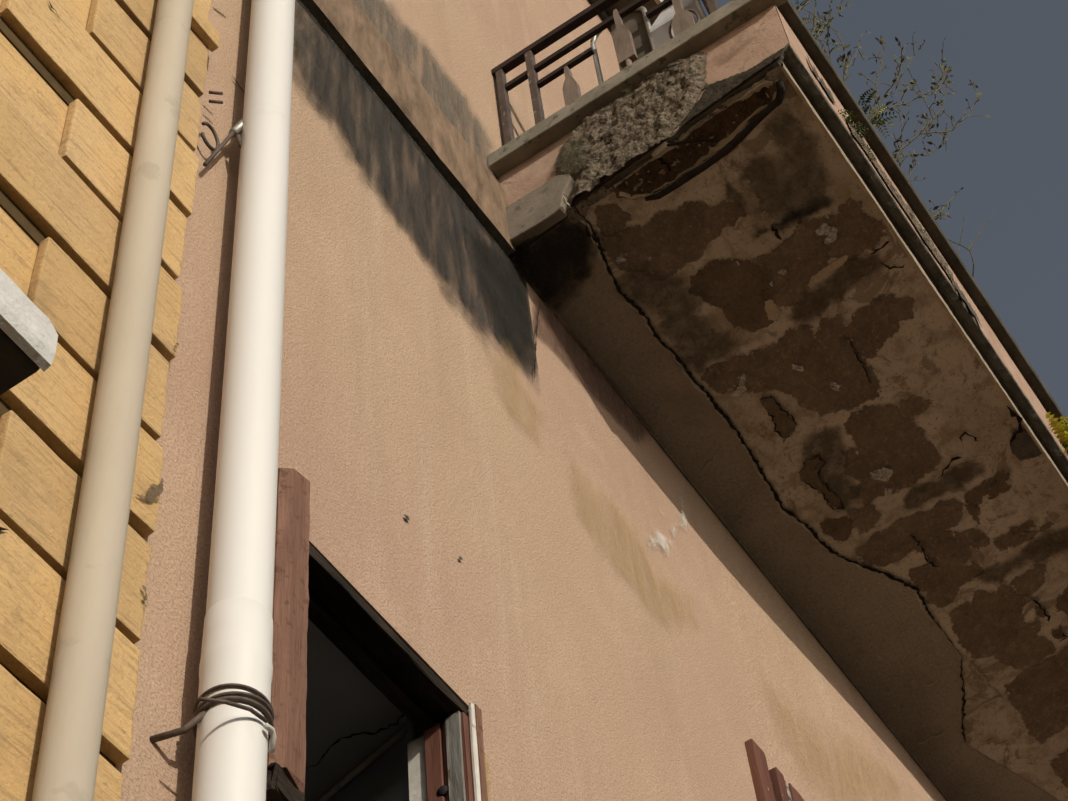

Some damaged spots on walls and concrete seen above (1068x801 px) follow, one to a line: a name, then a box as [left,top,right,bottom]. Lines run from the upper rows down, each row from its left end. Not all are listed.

water stain [293,0,595,370]
spalling [515,42,887,332]
spalling [845,114,982,327]
crack [562,194,1010,744]
peeling [701,293,1068,744]
peeling [1050,749,1068,787]